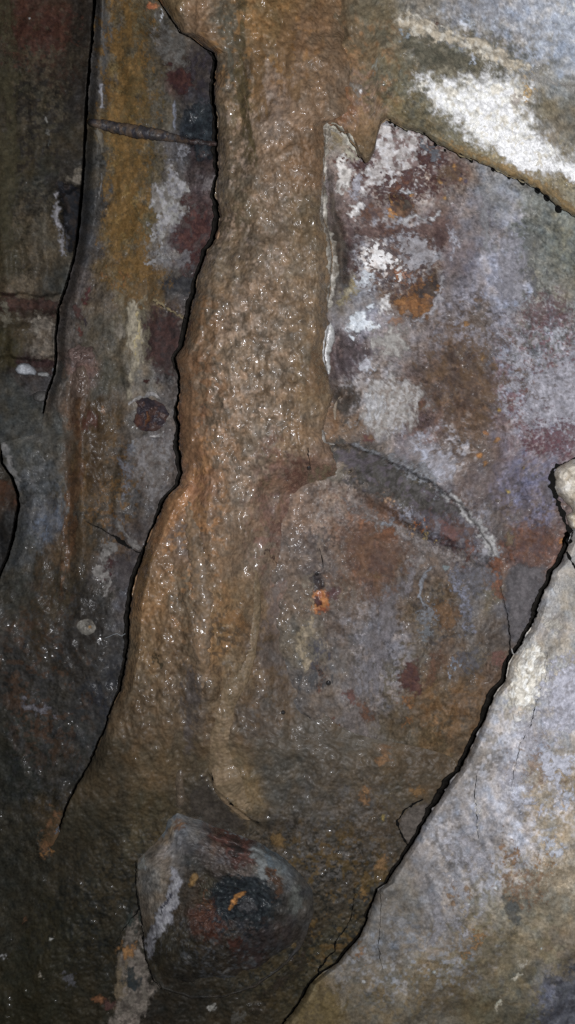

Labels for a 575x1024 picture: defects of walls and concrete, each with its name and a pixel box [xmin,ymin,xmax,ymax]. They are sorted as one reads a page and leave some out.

crack [43,0,96,414]
crack [59,5,220,829]
rust [143,306,201,479]
damp [144,9,216,270]
peeling [323,323,335,374]
peeling [319,123,358,309]
rust [388,274,445,326]
damp [394,0,575,183]
crack [0,449,20,578]
damp [340,498,503,738]
crack [282,457,575,1024]
rust [174,819,303,952]